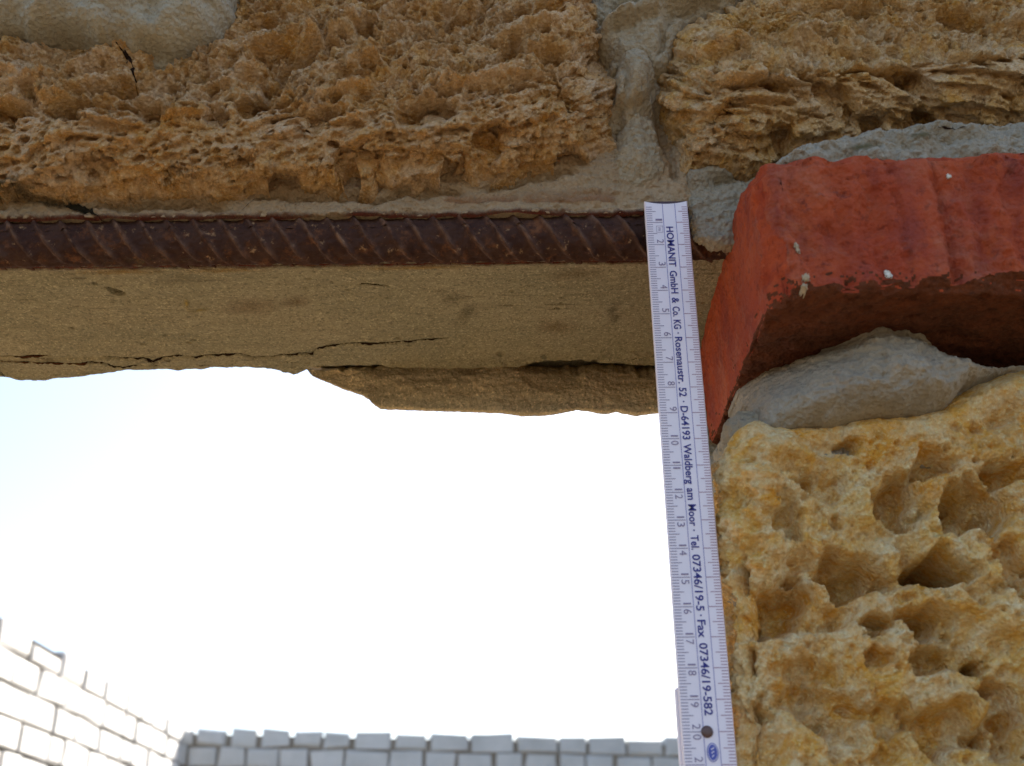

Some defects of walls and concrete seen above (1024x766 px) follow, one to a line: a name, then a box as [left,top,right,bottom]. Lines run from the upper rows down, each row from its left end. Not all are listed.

crack [116,42,138,95]
corrosion [0,213,310,222]
corrosion [346,209,644,219]
crack [2,337,449,369]